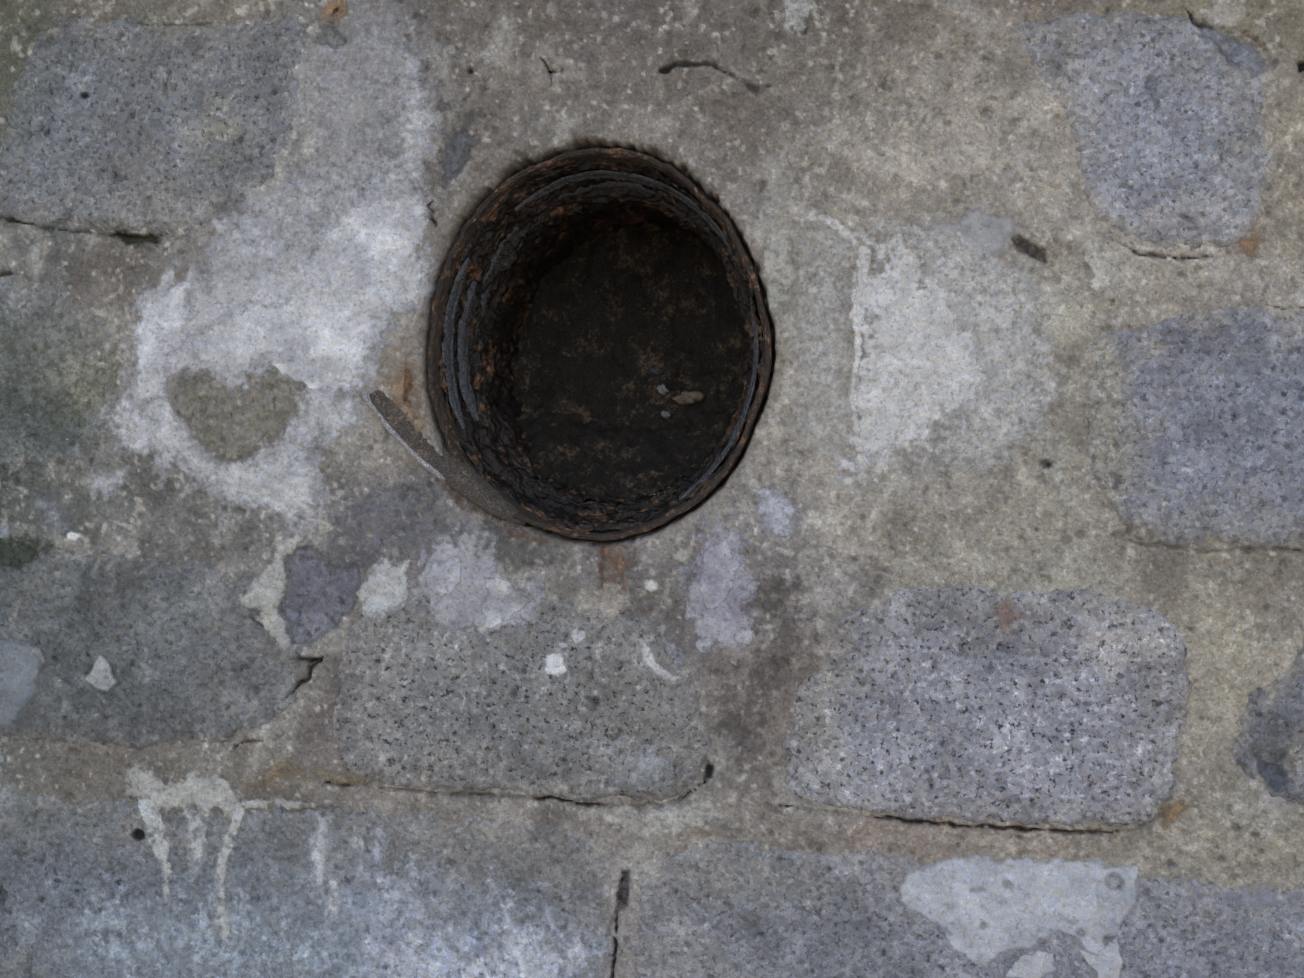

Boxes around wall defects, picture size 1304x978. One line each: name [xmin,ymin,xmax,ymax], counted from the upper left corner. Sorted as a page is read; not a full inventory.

crack [659,62,754,88]
peeling [132,6,478,519]
leakage [45,757,606,978]
crack [610,915,618,978]
peeling [900,855,1138,978]